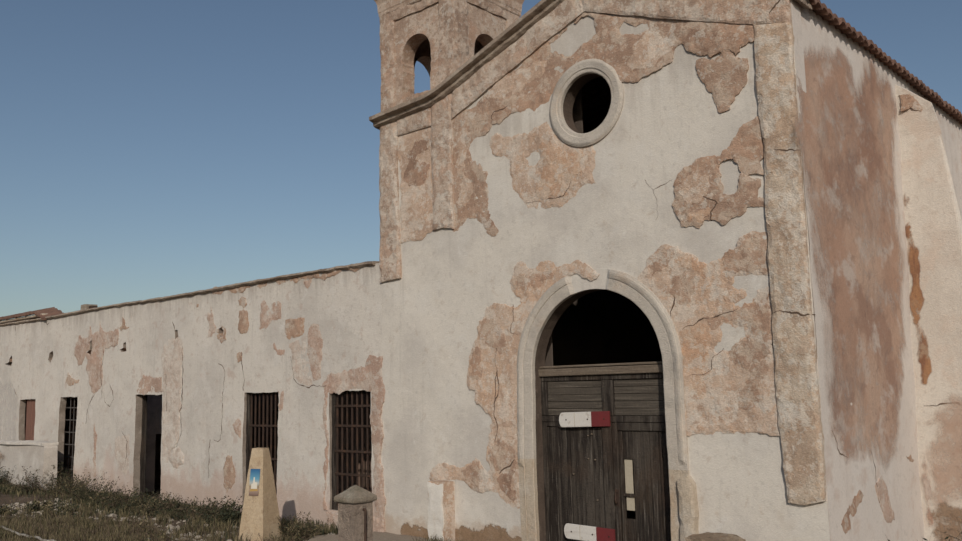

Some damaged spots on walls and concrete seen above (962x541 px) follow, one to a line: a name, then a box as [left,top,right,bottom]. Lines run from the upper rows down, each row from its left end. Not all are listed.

peeling [398,127,436,243]
peeling [452,12,765,237]
peeling [65,317,129,394]
peeling [137,337,183,463]
peeling [212,263,386,525]
crack [493,306,514,440]
peeling [429,260,600,509]
crack [670,297,737,330]
peeling [637,231,781,437]
crack [772,309,815,317]
leakage [795,50,905,462]